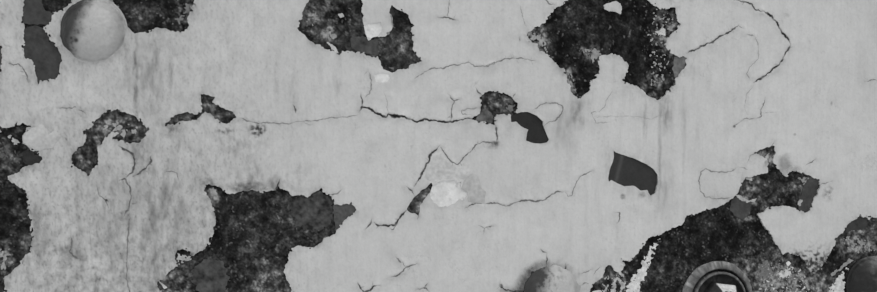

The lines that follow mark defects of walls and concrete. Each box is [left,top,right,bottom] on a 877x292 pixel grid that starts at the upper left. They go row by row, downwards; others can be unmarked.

peeling [364,22,382,38]
crack [689,27,736,52]
crack [740,1,790,82]
crack [243,78,481,124]
peeling [22,124,60,151]
peeling [511,112,549,144]
crack [367,127,498,230]
crack [468,172,589,207]
peeling [608,152,657,195]
rust [590,146,877,292]